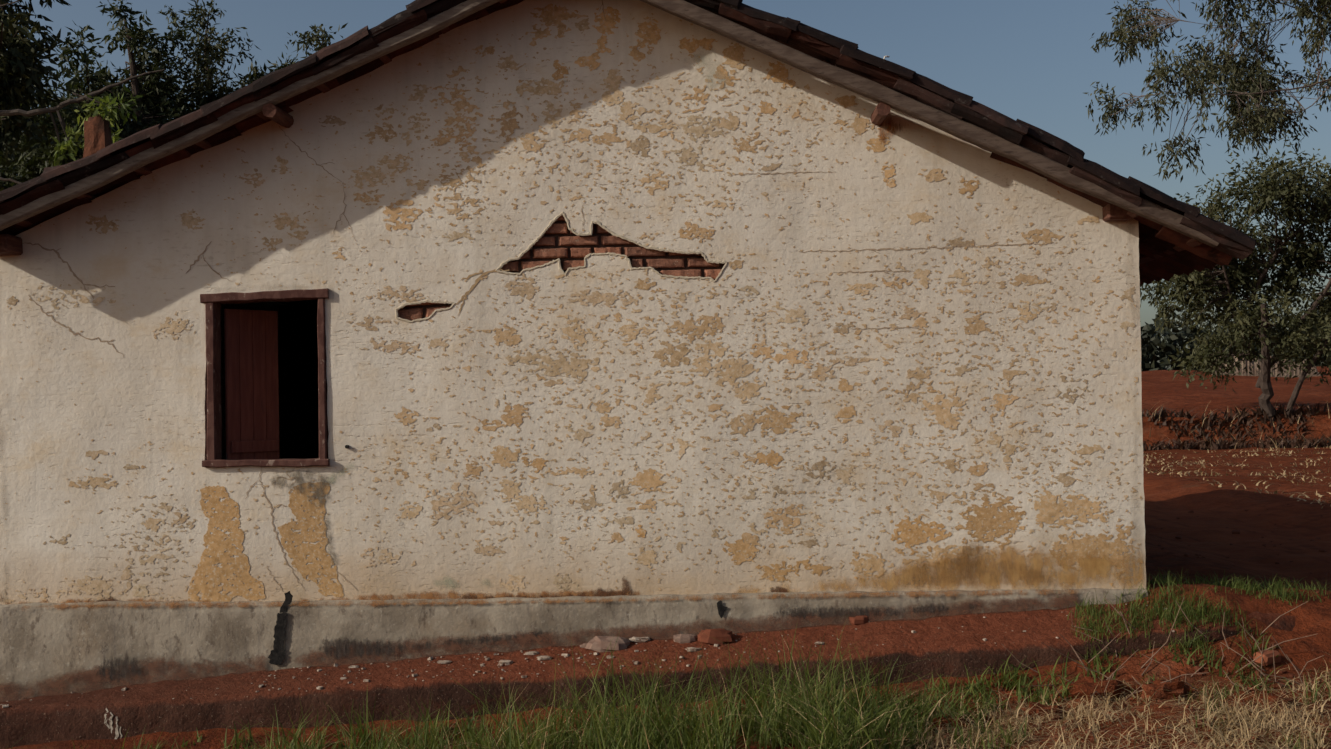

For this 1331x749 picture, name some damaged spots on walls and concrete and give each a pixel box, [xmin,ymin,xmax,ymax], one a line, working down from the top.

crack [279,126,356,241]
crack [22,243,115,299]
crack [29,295,124,357]
crack [455,269,509,315]
peeling [4,2,1143,603]
water stain [821,547,1143,591]
spalling [717,600,728,618]
water stain [776,604,948,619]